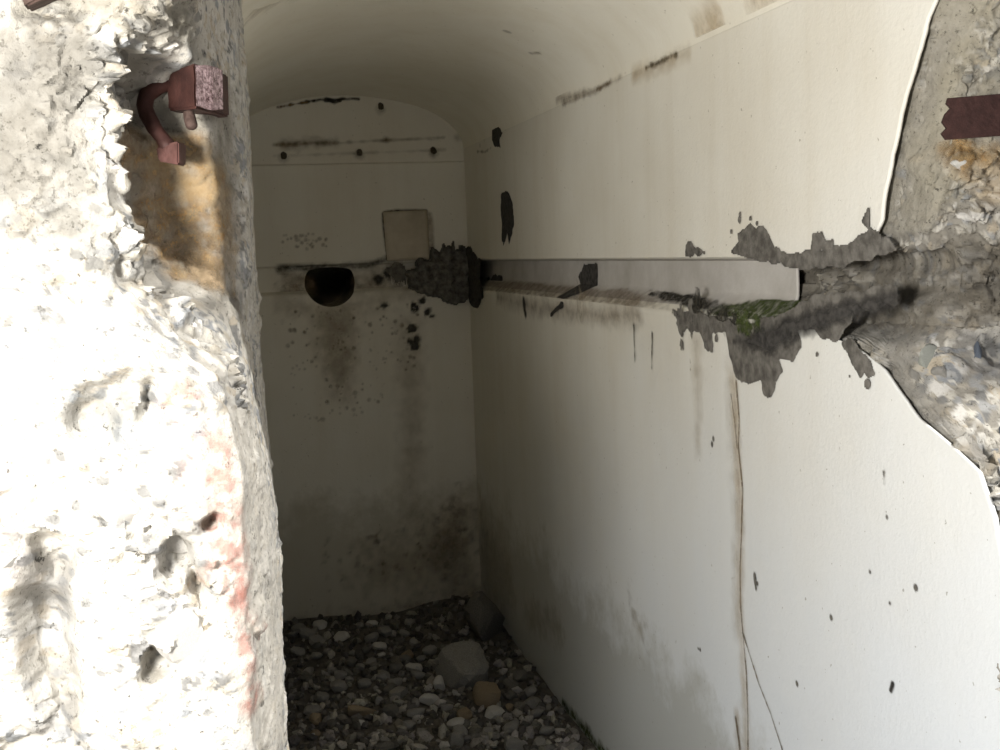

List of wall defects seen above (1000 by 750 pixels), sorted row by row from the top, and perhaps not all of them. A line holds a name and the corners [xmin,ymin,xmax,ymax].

corrosion [120,136,236,297]
leakage [278,257,390,289]
peeling [430,241,503,308]
peeling [685,241,705,258]
peeling [730,208,896,270]
leakage [407,324,420,350]
leakage [411,297,434,318]
spalling [674,284,898,398]